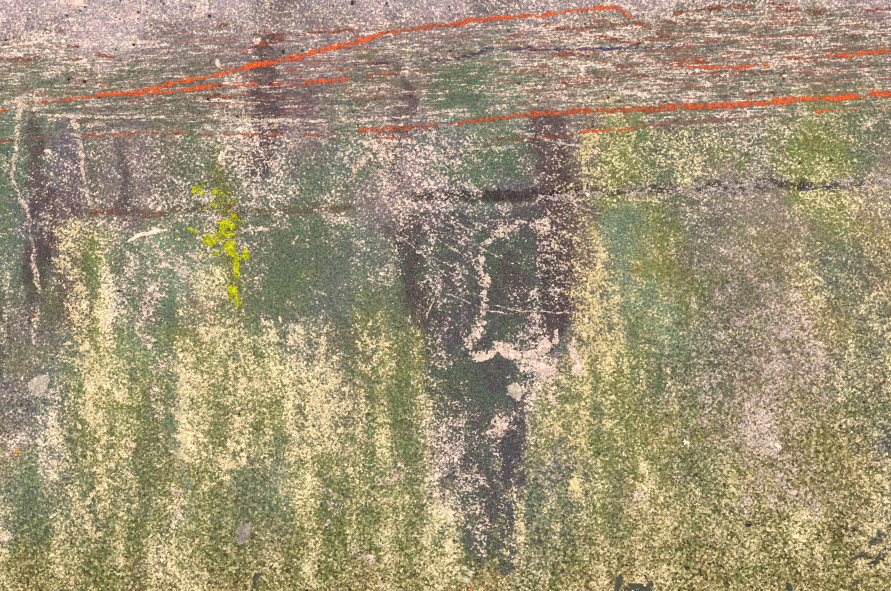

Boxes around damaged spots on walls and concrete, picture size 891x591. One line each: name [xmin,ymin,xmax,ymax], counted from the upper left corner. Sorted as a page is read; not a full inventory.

corrosion [248,28,354,49]
corrosion [523,20,673,45]
corrosion [670,56,782,76]
water stain [778,48,891,60]
water stain [0,5,675,223]
water stain [22,210,55,322]
water stain [388,90,891,575]